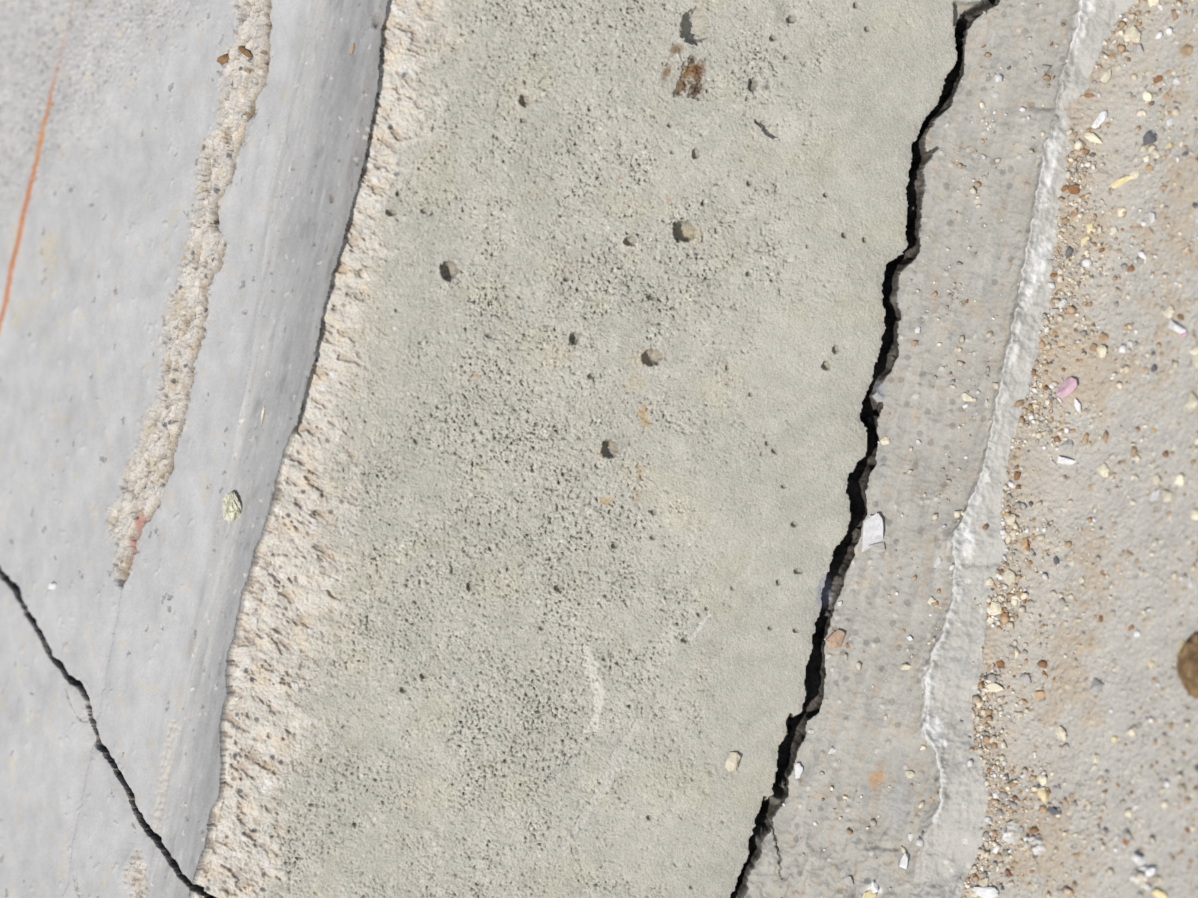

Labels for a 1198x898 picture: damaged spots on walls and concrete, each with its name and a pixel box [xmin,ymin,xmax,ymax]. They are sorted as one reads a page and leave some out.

crack [0,567,217,898]
spalling [104,0,274,589]
crack [730,0,1001,898]